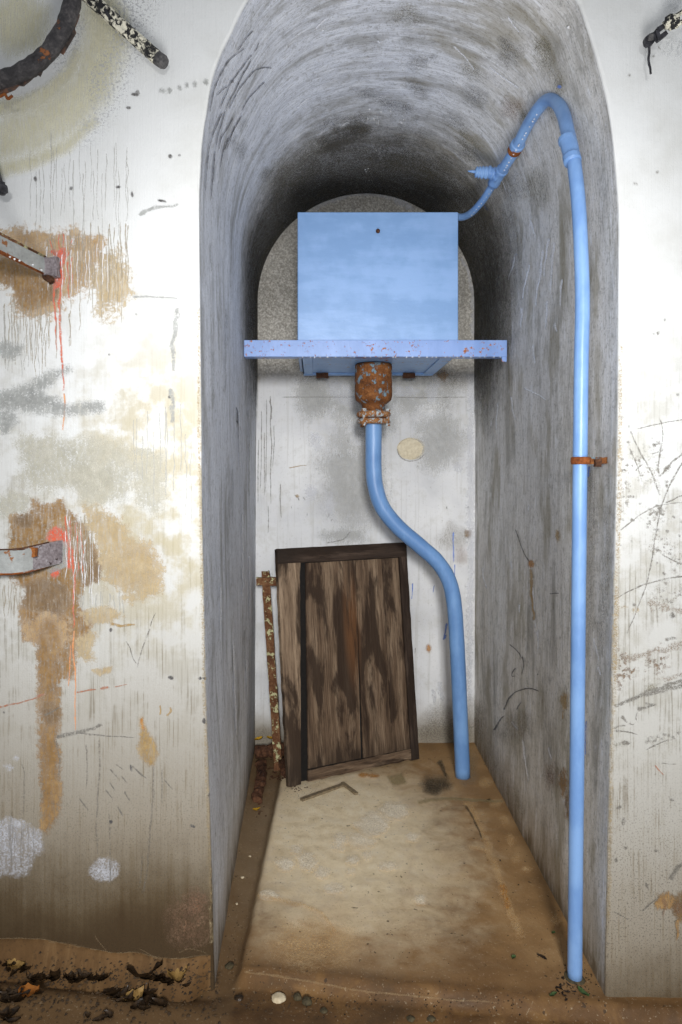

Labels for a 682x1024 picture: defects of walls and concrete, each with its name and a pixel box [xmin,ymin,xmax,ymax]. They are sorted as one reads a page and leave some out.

corrosion [0,223,135,430]
crack [627,420,682,633]
corrosion [0,499,166,832]
corrosion [654,891,682,939]